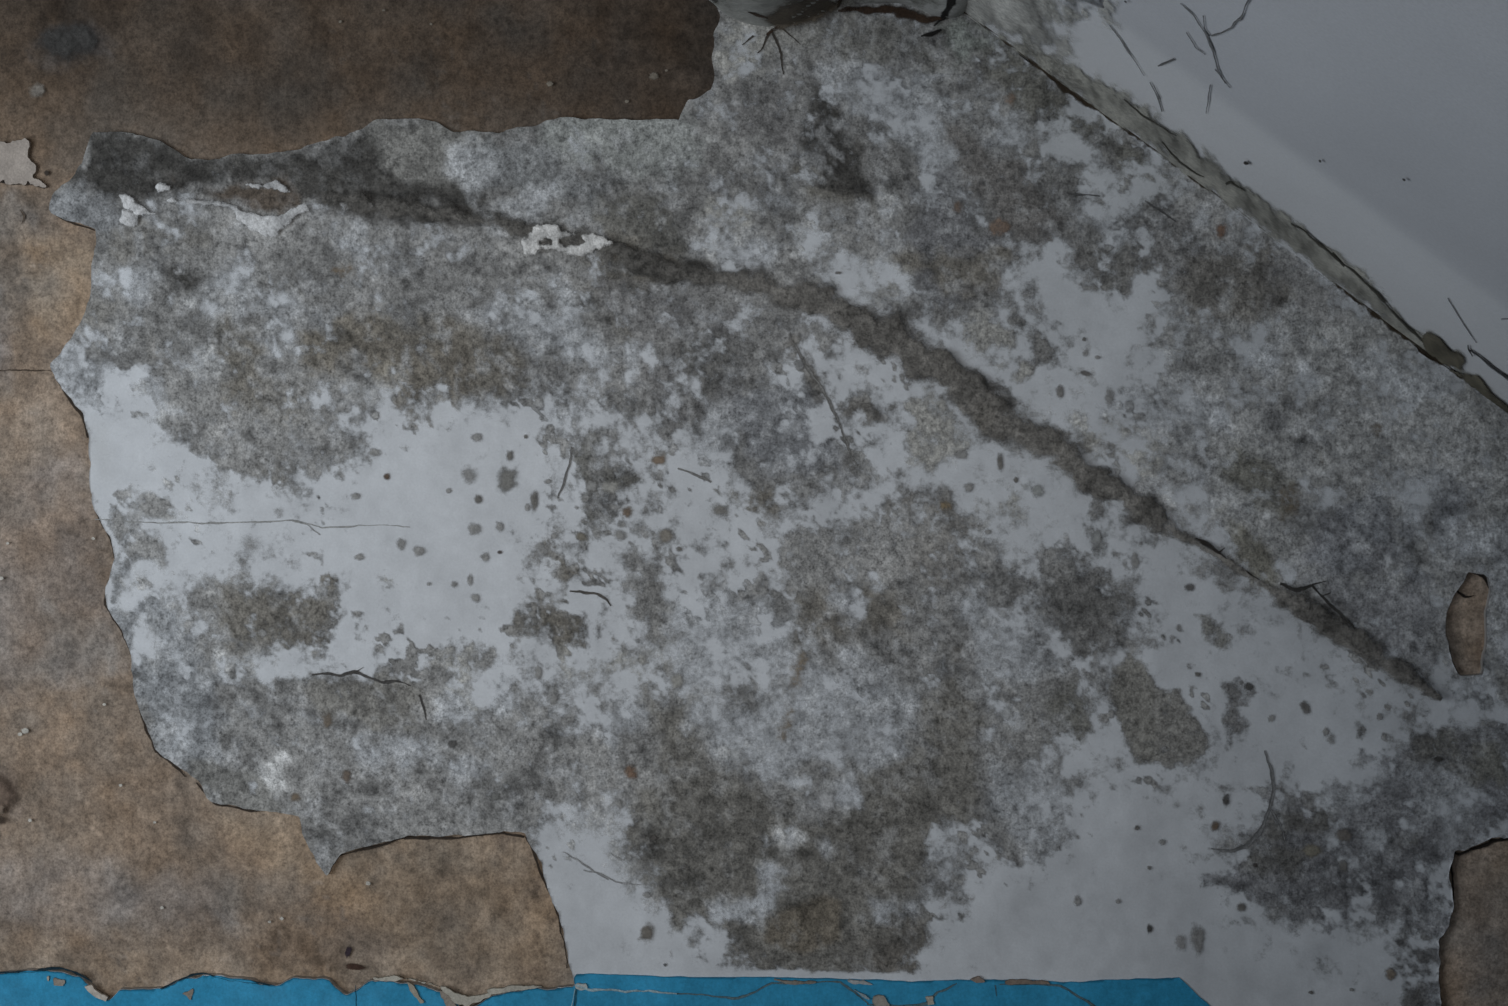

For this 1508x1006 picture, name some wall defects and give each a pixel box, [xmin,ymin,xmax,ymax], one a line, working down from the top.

crack [837,0,1508,380]
water stain [42,0,1508,710]
spalling [1413,331,1508,413]
spalling [0,0,1095,1006]
crack [557,447,573,498]
crack [570,590,611,606]
crack [1195,537,1356,630]
spalling [1445,572,1489,675]
water stain [110,469,1157,974]
peeling [1103,625,1256,806]
water stain [1200,685,1508,1006]
spalling [1438,837,1508,1006]